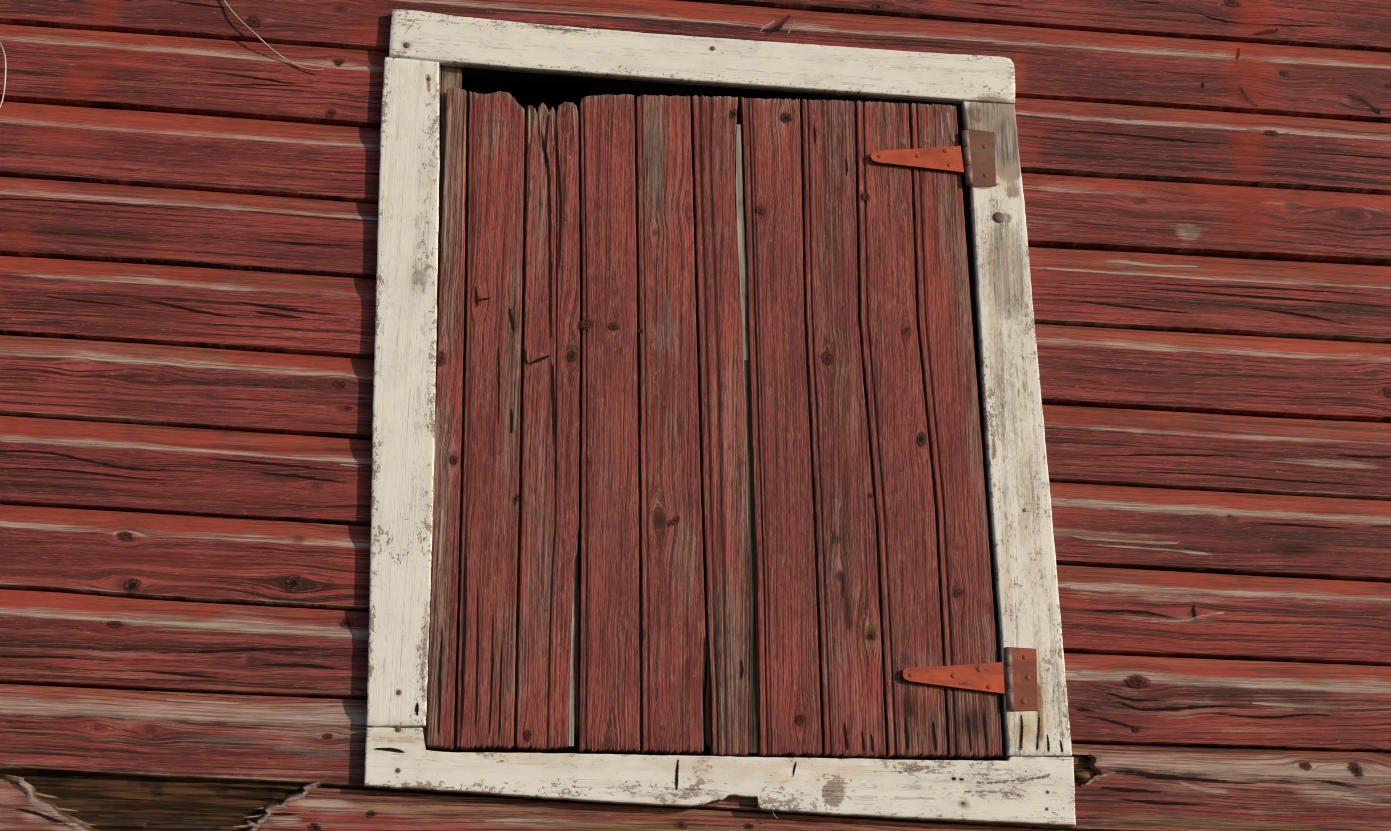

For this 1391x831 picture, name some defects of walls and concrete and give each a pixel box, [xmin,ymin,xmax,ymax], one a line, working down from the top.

crack [475,113,562,483]